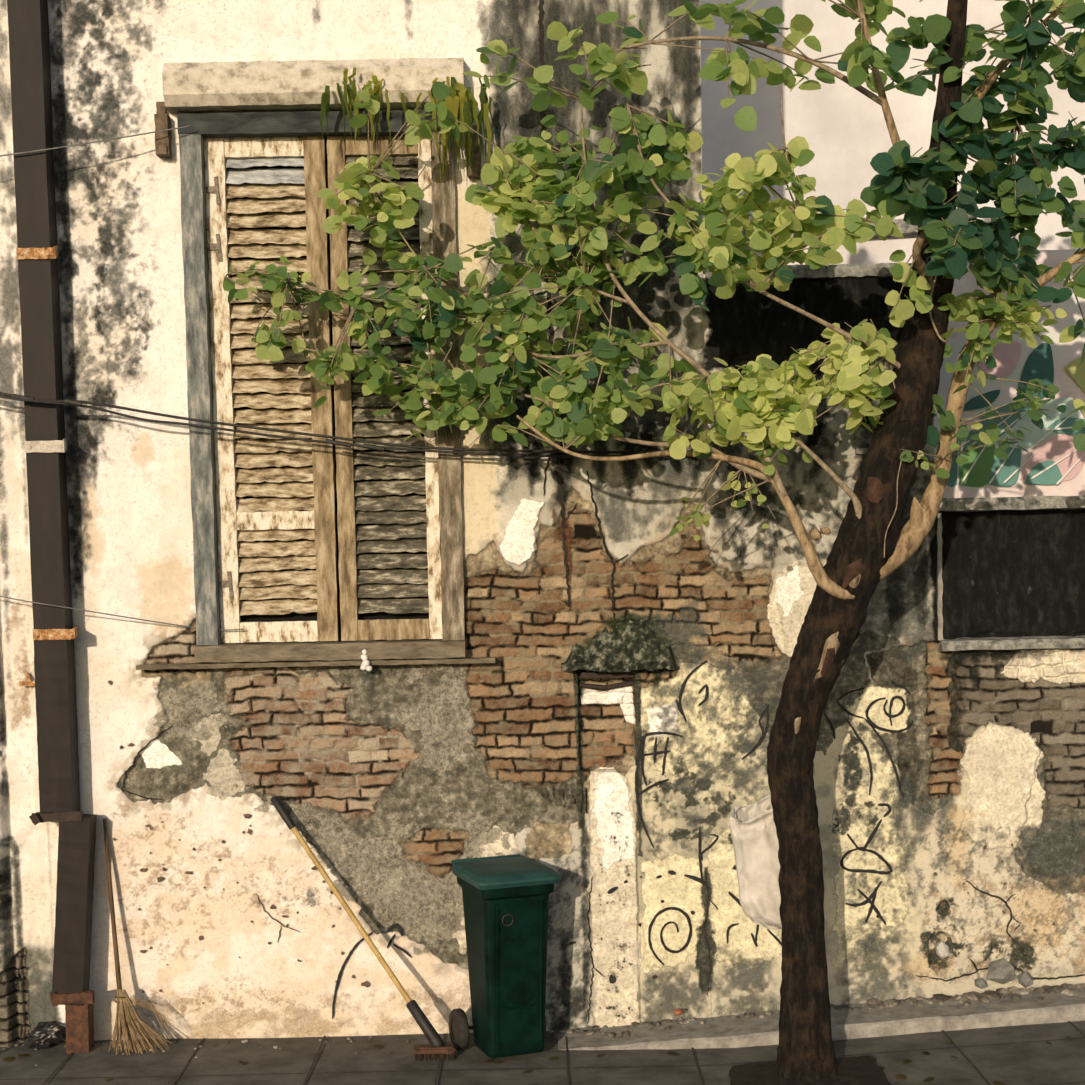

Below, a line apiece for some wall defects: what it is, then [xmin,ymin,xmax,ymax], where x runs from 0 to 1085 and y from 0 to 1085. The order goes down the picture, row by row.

leakage [480,0,700,203]
leakage [0,256,25,427]
leakage [50,0,152,596]
leakage [537,177,910,400]
leakage [482,375,849,567]
flaking render [0,947,30,1047]
leakage [0,856,61,1033]
flaking render [116,487,817,1028]
leakage [639,867,778,1022]
leakage [843,909,911,1004]
flaking render [816,631,1085,964]
leakage [832,720,1085,971]